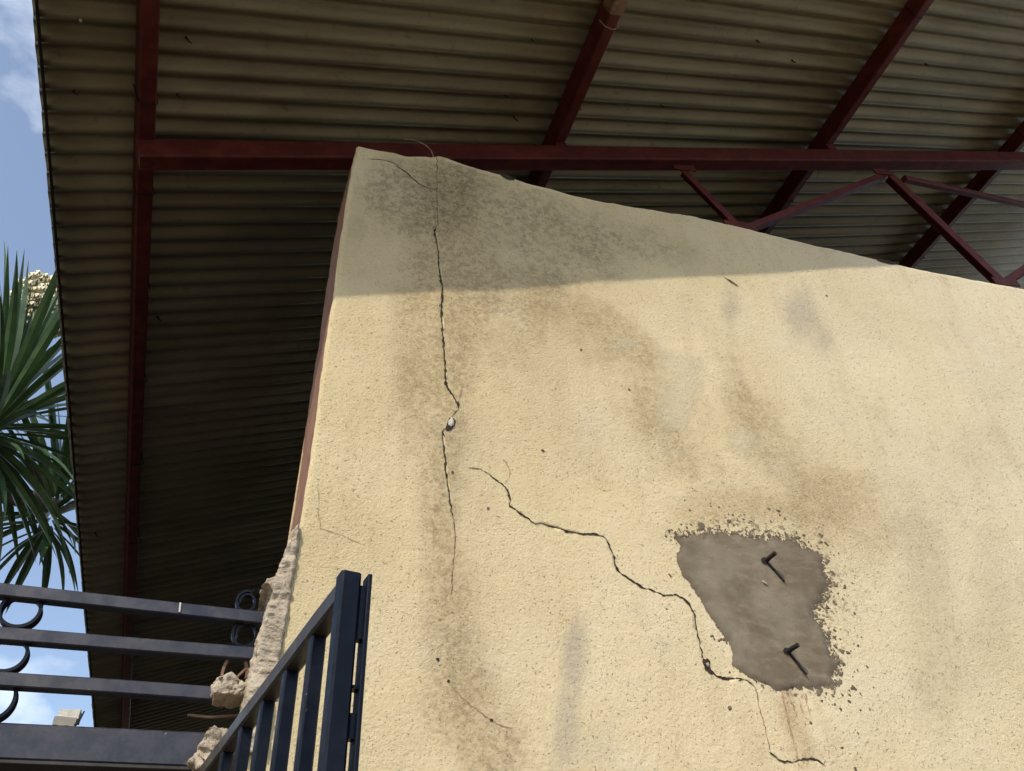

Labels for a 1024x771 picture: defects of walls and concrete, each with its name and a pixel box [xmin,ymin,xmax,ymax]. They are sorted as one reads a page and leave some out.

flaking render [239,524,300,712]
crack [377,156,825,769]